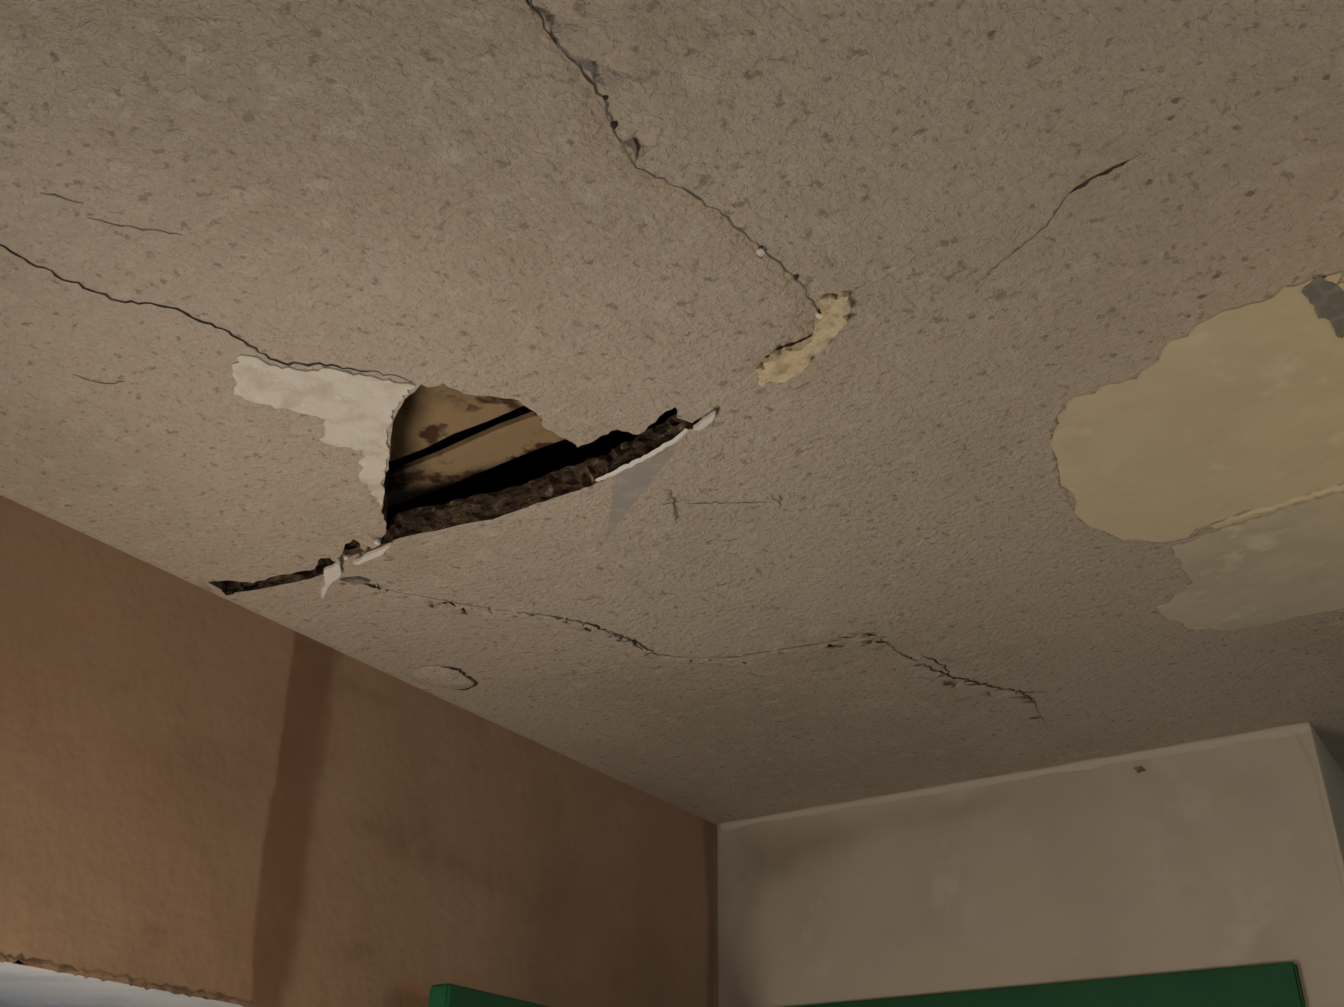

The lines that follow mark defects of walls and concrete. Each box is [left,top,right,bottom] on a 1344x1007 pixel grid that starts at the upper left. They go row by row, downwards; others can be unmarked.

crack [525,0,823,319]
crack [40,192,183,236]
crack [982,153,1142,280]
crack [0,244,413,384]
peeling [756,291,851,386]
flaking render [605,442,679,542]
peeling [693,410,716,431]
peeling [1045,271,1344,631]
peeling [321,543,391,598]